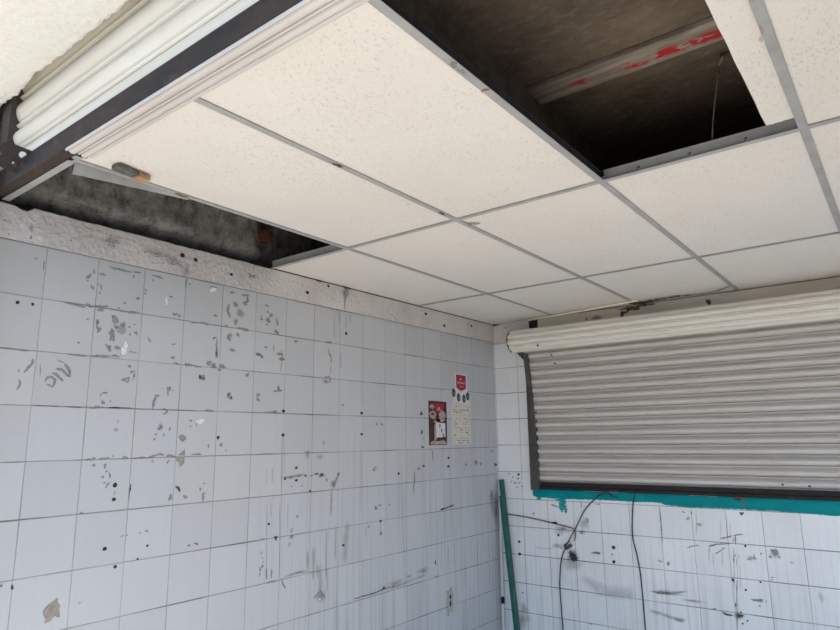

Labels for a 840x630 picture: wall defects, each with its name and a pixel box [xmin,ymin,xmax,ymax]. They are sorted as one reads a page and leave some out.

peeling [87,302,138,358]
peeling [227,292,249,352]
peeling [40,359,71,388]
spalling [176,435,186,467]
spalling [43,598,60,623]